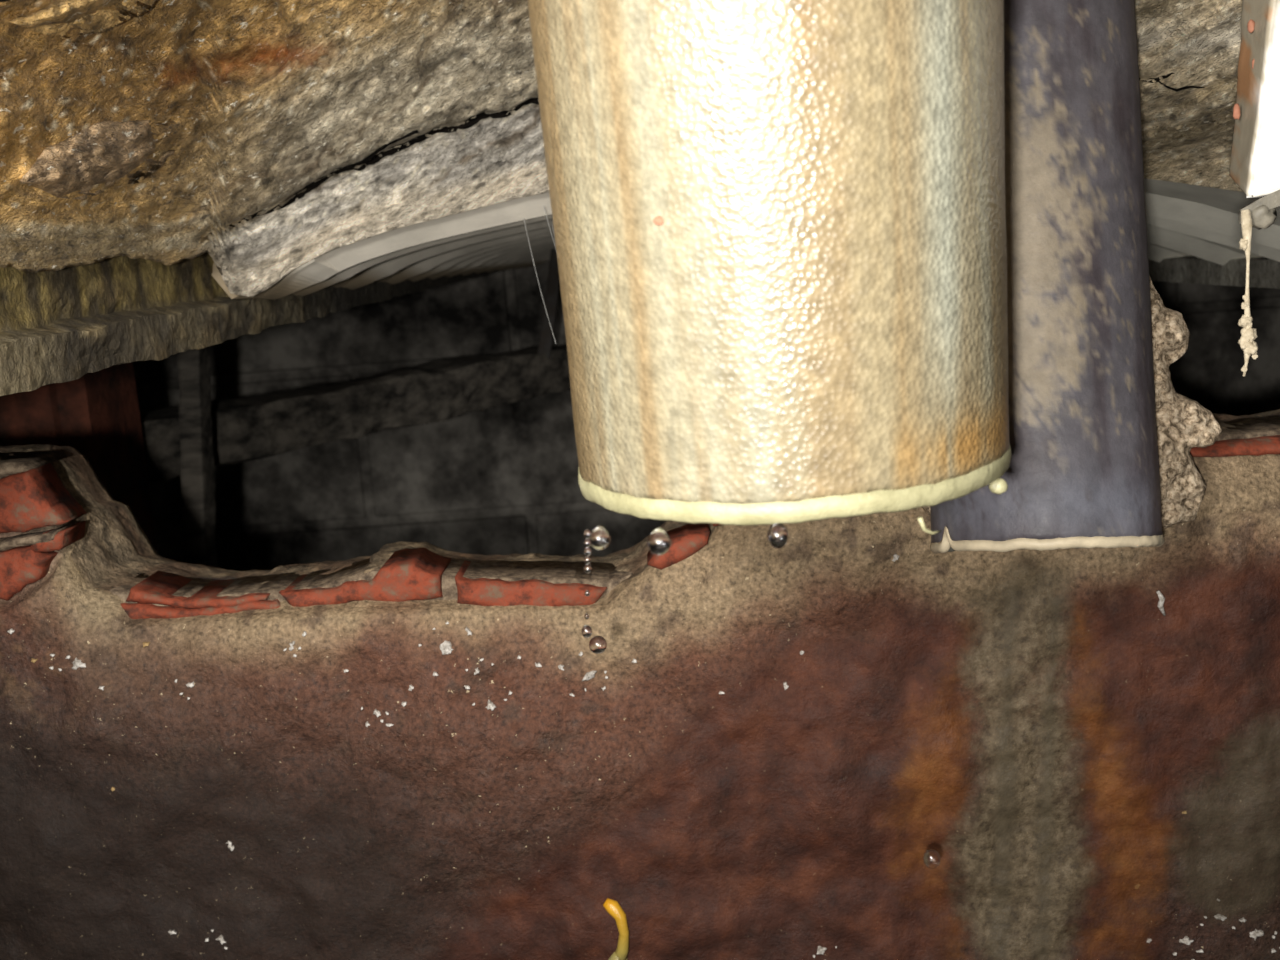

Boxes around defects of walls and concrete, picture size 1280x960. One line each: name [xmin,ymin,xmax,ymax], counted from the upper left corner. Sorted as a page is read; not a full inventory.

spalling [0,451,87,601]
spalling [647,523,722,570]
spalling [108,547,633,619]
leakage [49,653,86,671]
leakage [361,685,414,727]
leakage [432,621,453,655]
leakage [464,658,512,711]
rust [451,611,961,960]
leakage [957,569,1089,960]
leakage [603,898,629,960]
leakage [1173,936,1204,960]
leakage [1200,898,1280,953]